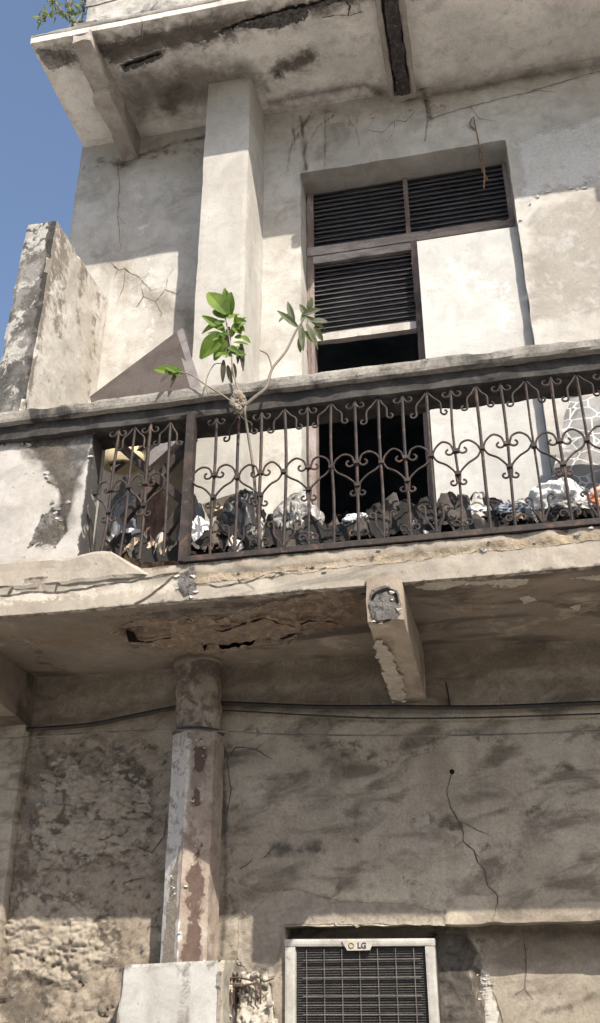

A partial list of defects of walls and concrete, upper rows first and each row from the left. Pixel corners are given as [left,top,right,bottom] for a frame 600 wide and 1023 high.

spalling [105,30,172,72]
leakage [124,65,246,115]
leakage [97,0,330,63]
spalling [180,0,344,44]
leakage [271,49,315,77]
crack [111,164,185,325]
peeling [19,433,95,548]
spalling [113,586,403,655]
peeling [372,640,407,703]
crack [446,774,498,921]
corrosion [178,844,205,962]
spalling [216,889,499,1023]